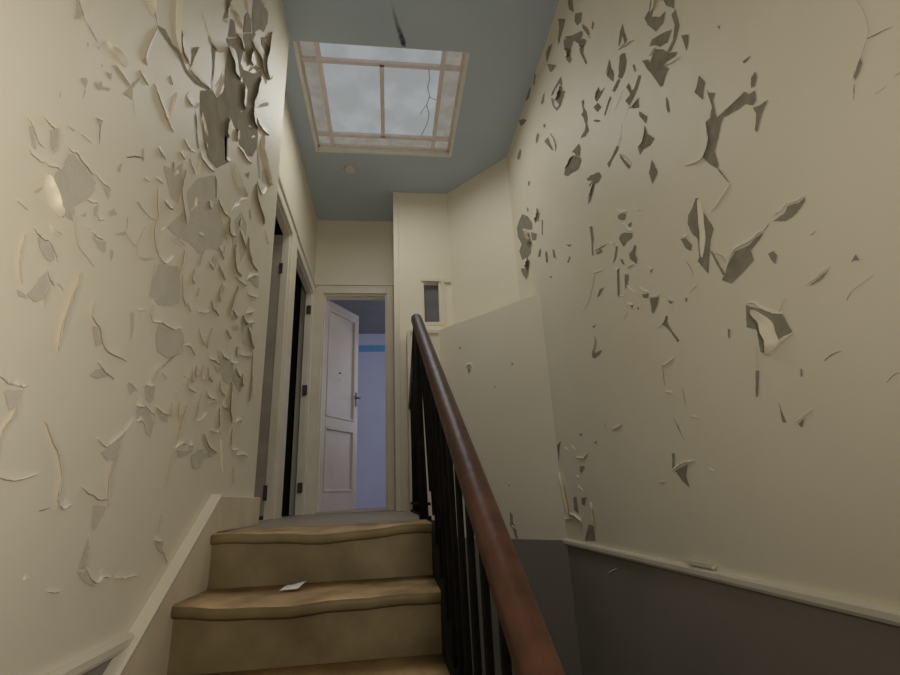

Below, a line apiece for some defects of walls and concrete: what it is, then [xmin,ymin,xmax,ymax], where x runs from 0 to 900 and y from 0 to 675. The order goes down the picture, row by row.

peeling [541,0,594,111]
peeling [564,0,688,176]
peeling [27,115,117,351]
peeling [75,0,275,586]
peeling [517,208,556,280]
peeling [587,139,632,203]
peeling [590,208,674,319]
peeling [649,161,657,184]
peeling [680,72,805,284]
peeling [745,298,793,397]
peeling [557,441,595,541]
peeling [672,453,694,488]